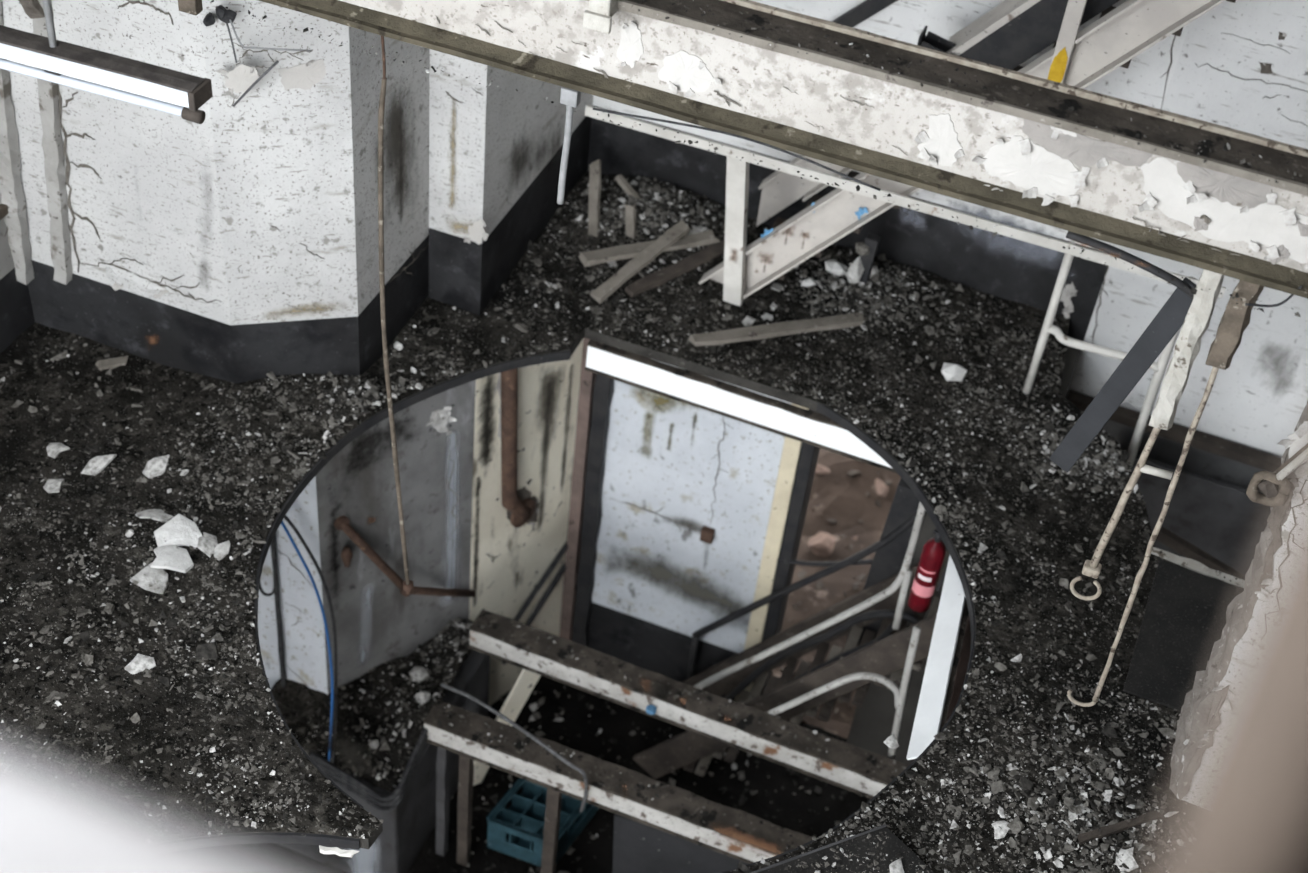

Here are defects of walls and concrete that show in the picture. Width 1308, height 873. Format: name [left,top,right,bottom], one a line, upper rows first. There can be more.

crack [118,0,174,25]
crack [58,91,221,303]
damp [383,98,407,218]
peeling [914,114,1308,265]